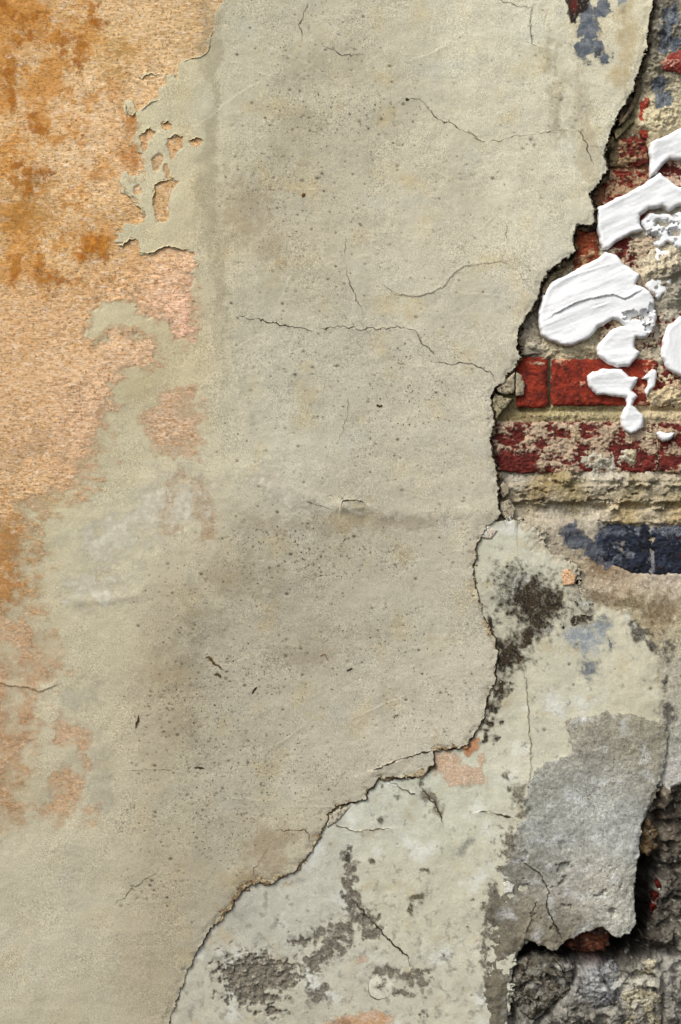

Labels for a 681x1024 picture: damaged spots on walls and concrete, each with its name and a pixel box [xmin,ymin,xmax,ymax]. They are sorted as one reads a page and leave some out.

peeling [0,0,222,660]
crack [239,278,495,380]
spalling [169,0,656,1024]
crack [334,822,389,832]
crack [374,750,443,823]
crack [351,898,410,965]